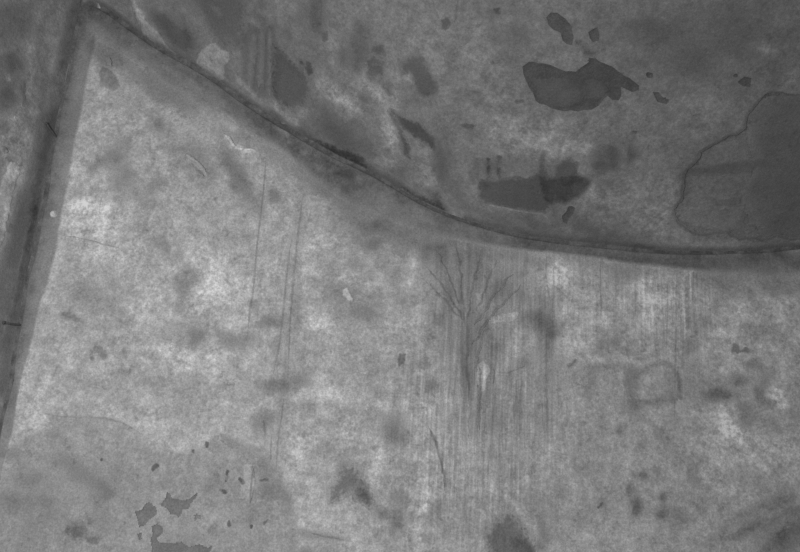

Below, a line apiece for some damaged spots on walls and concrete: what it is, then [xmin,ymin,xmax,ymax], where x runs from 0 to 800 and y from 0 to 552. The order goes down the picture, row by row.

crack [0,0,800,436]